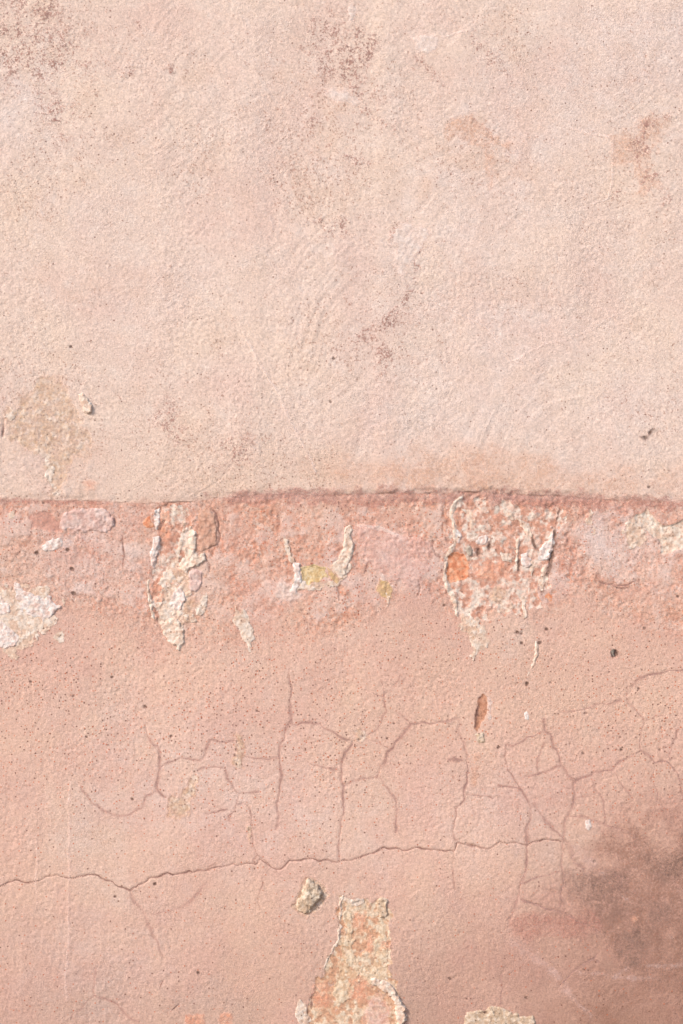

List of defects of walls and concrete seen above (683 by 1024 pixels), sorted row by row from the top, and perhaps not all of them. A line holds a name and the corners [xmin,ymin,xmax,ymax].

peeling [0,582,76,660]
peeling [143,504,208,651]
peeling [275,525,354,601]
peeling [442,489,572,661]
crack [0,762,492,891]
crack [279,678,311,792]
crack [335,733,353,812]
peeling [295,895,407,1024]
peeling [464,998,536,1024]
crack [522,824,603,933]
crack [499,718,673,808]
leakage [514,828,683,984]